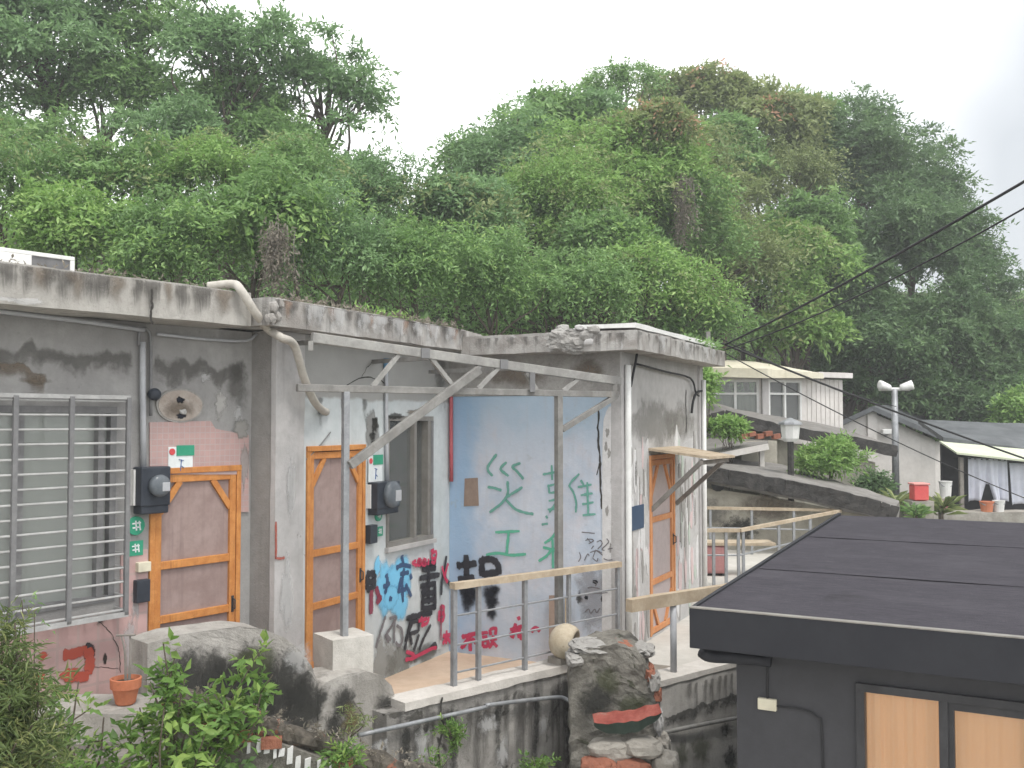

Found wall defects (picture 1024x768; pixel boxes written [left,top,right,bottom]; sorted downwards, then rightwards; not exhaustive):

water stain [0,263,230,307]
crack [148,289,156,324]
spalling [544,324,600,355]
water stain [0,342,130,388]
water stain [156,359,243,400]
crack [595,411,603,509]